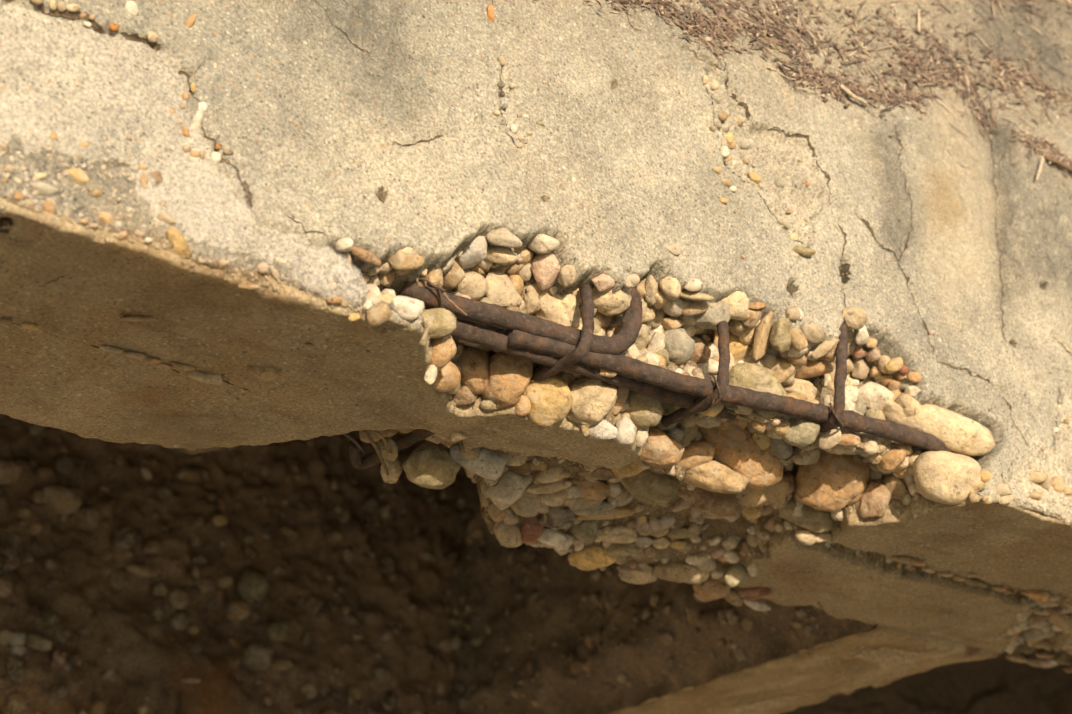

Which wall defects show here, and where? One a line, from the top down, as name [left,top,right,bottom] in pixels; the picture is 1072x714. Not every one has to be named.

spalling [0,205,13,234]
crack [7,0,256,215]
spalling [376,186,387,204]
spalling [494,67,545,149]
spalling [702,69,825,256]
spalling [839,263,851,283]
crack [687,6,1030,448]
spalling [981,384,1072,525]
spalling [0,424,408,714]
spalling [293,587,463,714]